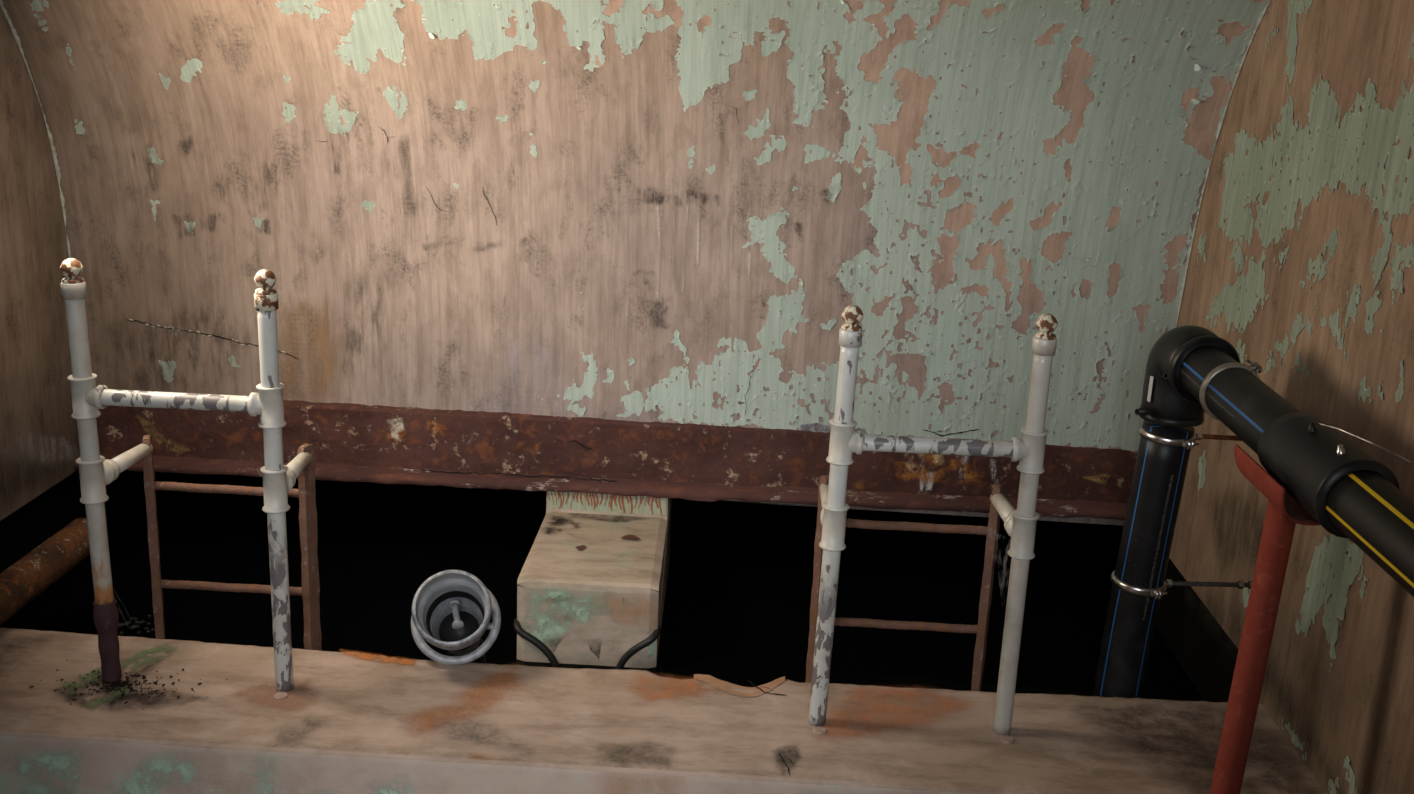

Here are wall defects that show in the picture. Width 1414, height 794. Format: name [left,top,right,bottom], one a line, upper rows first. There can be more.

peeling [275,0,330,21]
peeling [159,58,203,89]
spalling [0,0,72,258]
peeling [283,102,296,123]
peeling [323,94,359,137]
peeling [333,0,1414,451]
peeling [159,358,176,383]
peeling [1198,450,1207,491]
rust [547,491,667,515]
peeling [1242,587,1251,608]
peeling [1295,534,1369,673]
leakage [777,747,799,765]